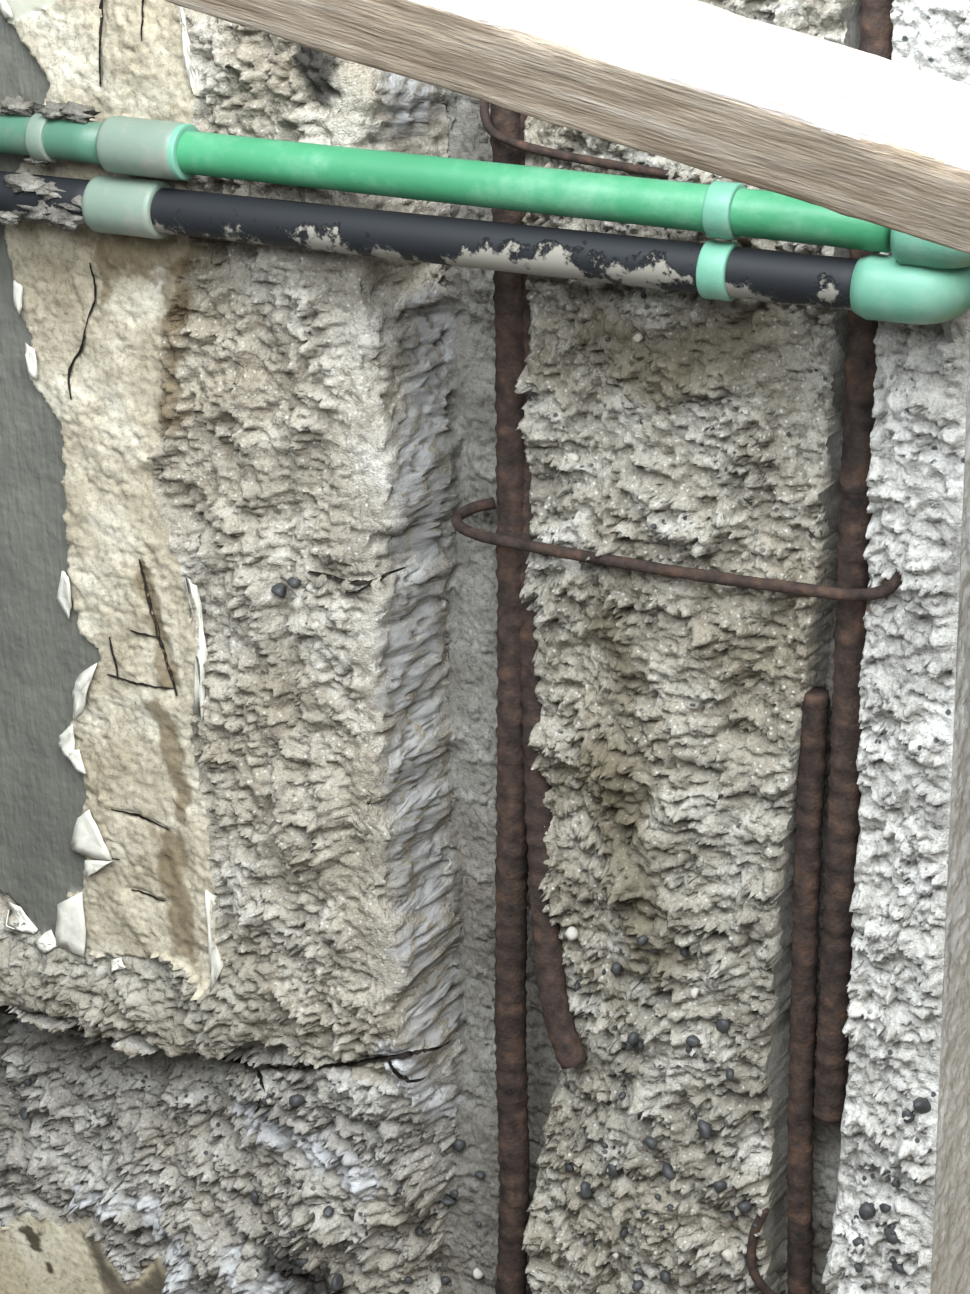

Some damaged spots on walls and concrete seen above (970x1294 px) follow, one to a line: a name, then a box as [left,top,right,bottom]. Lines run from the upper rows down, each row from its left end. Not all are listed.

spalling [0,0,451,157]
spalling [697,0,970,85]
spalling [16,160,452,217]
spalling [489,103,768,191]
spalling [491,208,893,259]
crack [107,559,178,696]
spalling [0,218,485,1294]
spalling [473,271,970,1294]
crack [193,1037,454,1112]
water stain [19,1225,53,1273]
water stain [67,1185,206,1294]